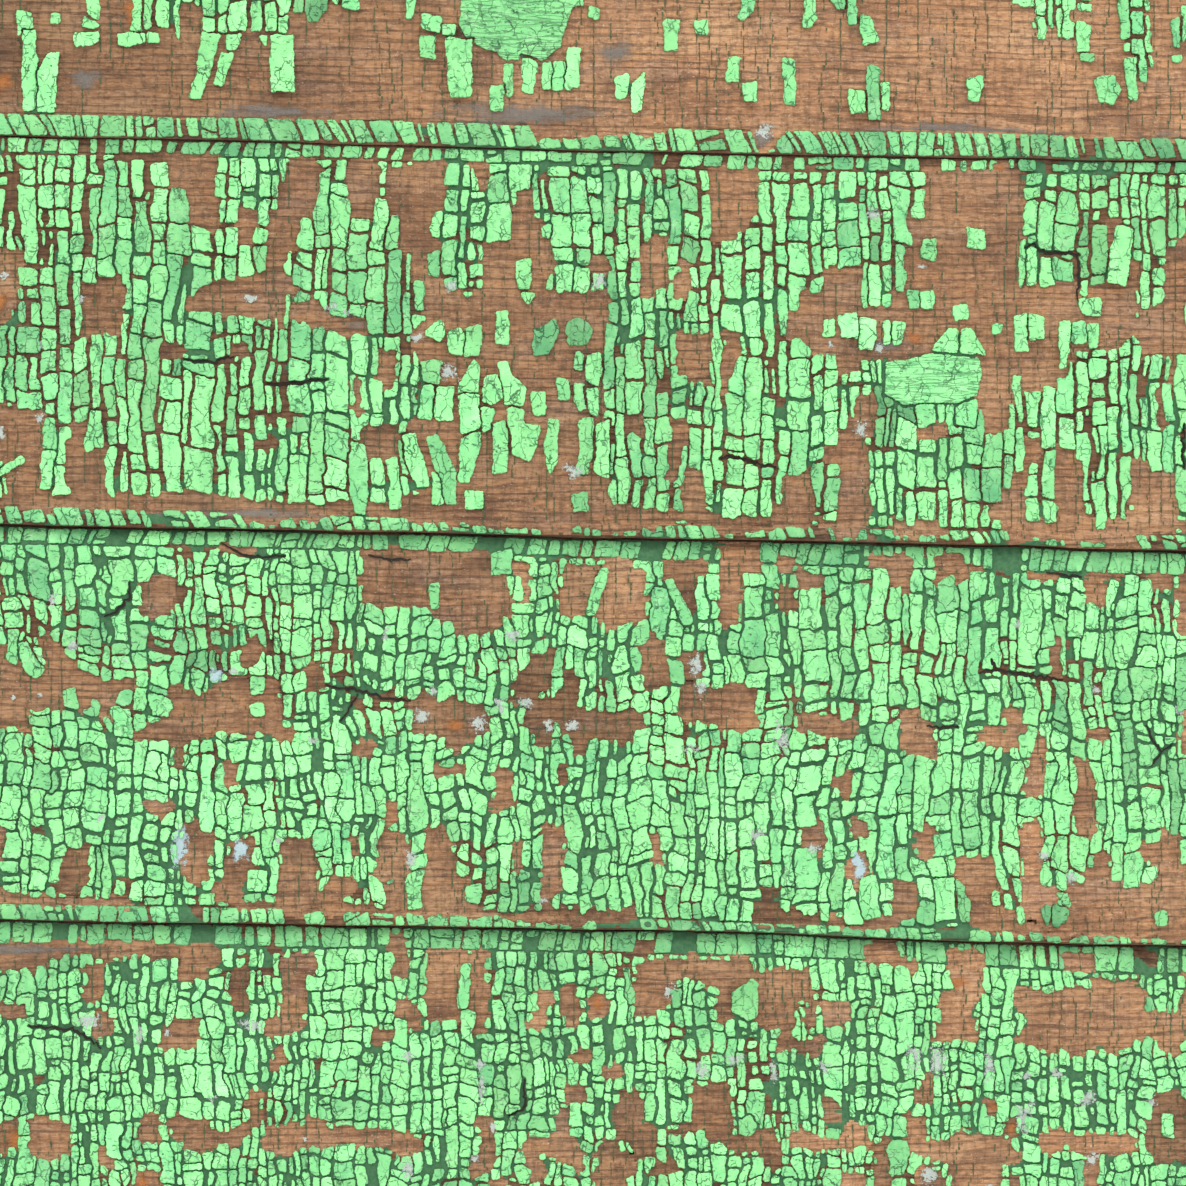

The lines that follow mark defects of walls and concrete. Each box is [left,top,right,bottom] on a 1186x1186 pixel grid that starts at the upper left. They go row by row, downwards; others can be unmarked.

peeling [0,0,1186,245]
crack [1025,243,1081,301]
crack [267,378,328,386]
peeling [0,151,1186,739]
crack [720,455,777,468]
peeling [0,629,300,773]
crack [325,684,411,721]
peeling [508,648,649,786]
crack [979,659,1063,681]
peeling [951,756,1186,1059]
crack [29,1025,102,1049]
peeling [518,1045,1022,1186]